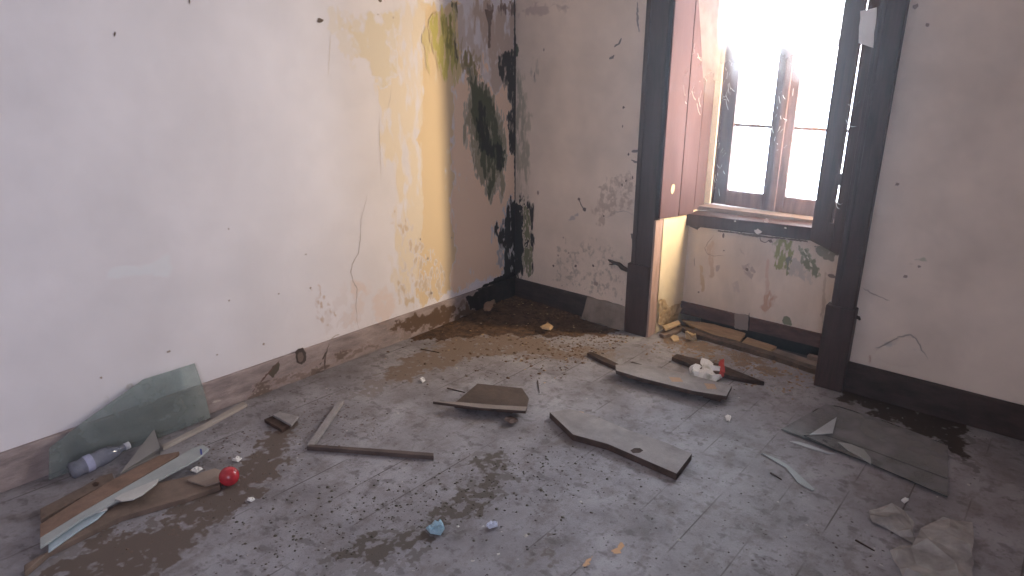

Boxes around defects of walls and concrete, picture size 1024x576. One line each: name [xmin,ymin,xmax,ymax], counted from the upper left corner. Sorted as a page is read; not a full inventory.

damp [308,0,570,336]
crack [875,334,928,359]